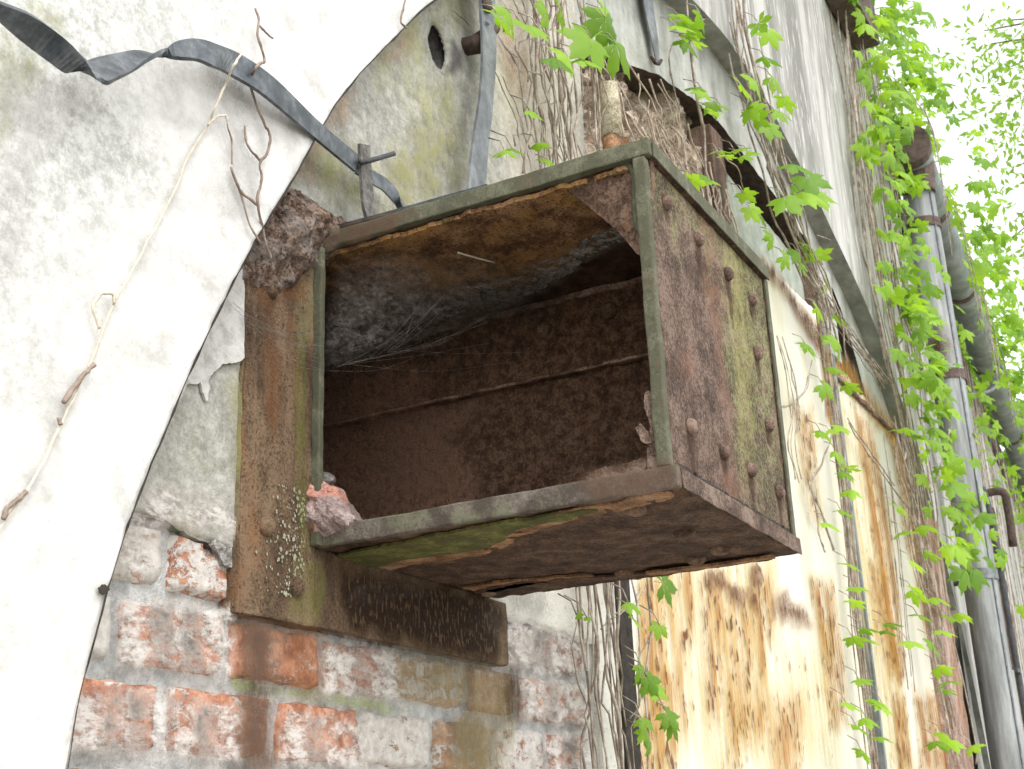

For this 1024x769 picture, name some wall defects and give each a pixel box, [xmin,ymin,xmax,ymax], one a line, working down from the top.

peeling [179,265,245,401]
flaking render [120,490,236,572]
rust [761,258,948,769]
peeling [70,693,242,760]
peeling [119,602,233,673]
leakage [233,617,392,769]
rust [344,491,849,769]